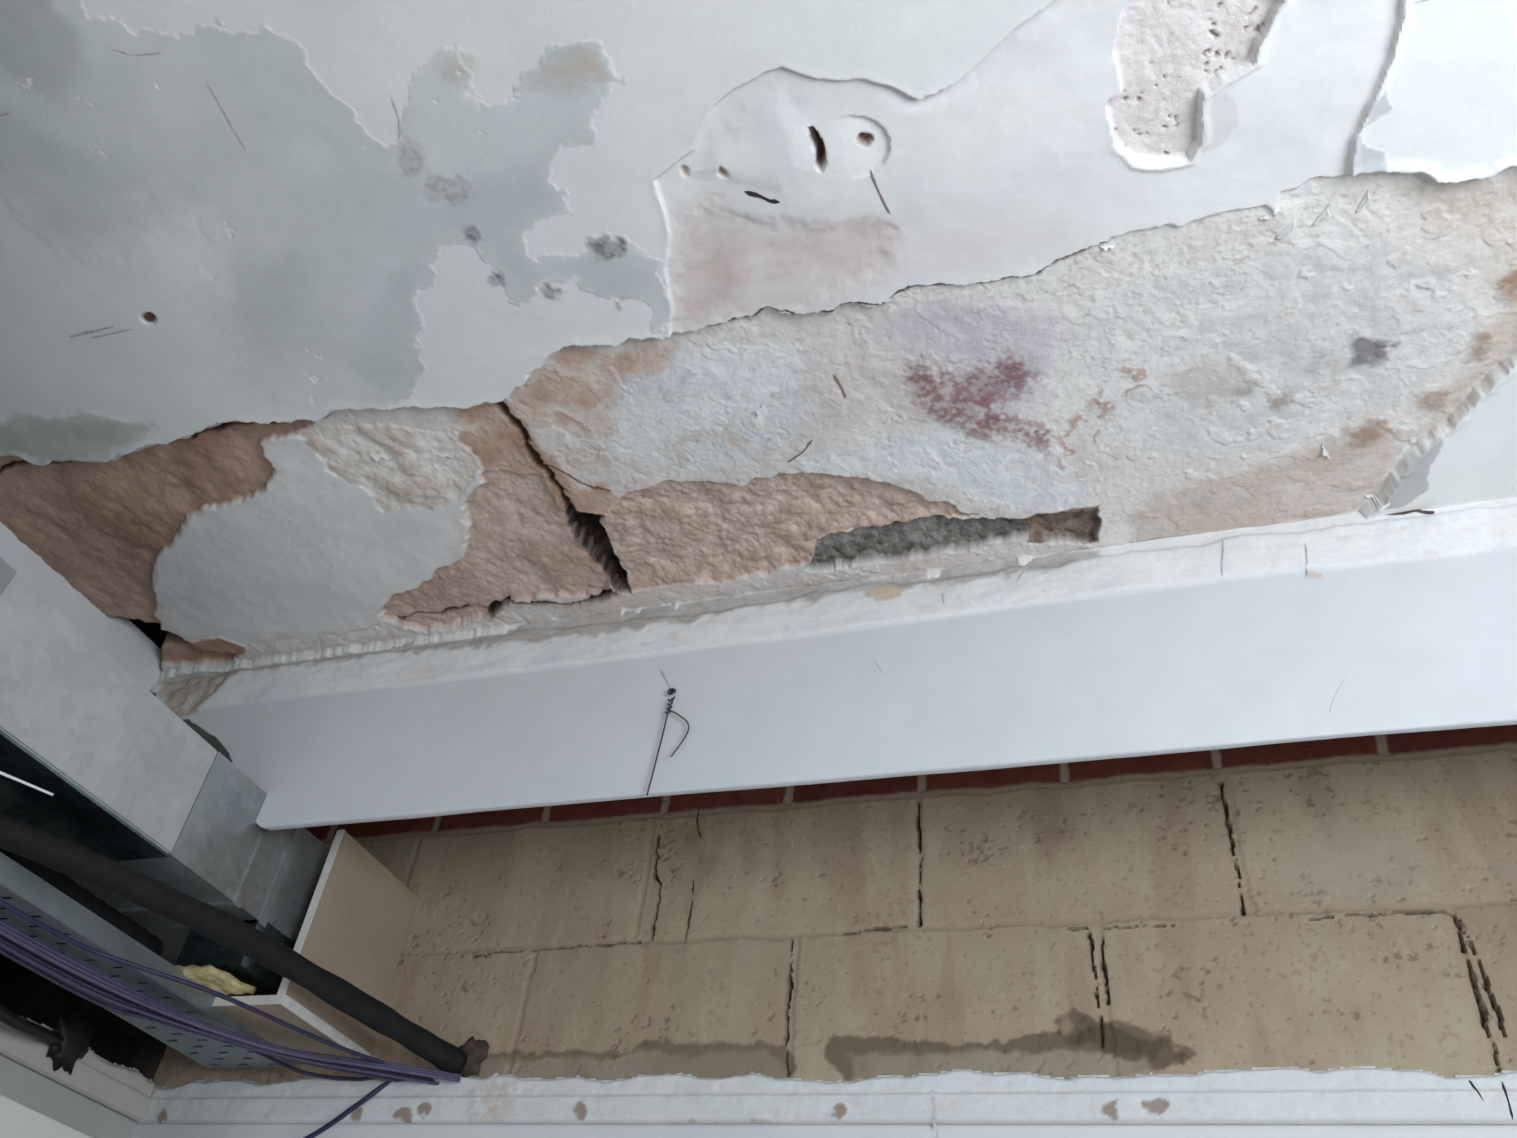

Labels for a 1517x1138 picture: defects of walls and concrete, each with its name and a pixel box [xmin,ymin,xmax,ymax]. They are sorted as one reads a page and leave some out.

leakage [0,0,675,422]
spalling [0,0,1517,681]
leakage [844,290,1077,460]
crack [398,401,632,625]
crack [474,950,510,958]
crack [565,834,694,949]
crack [783,941,794,1046]
crack [842,801,923,935]
leakage [823,1006,1200,1082]
crack [1067,924,1174,1023]
crack [1217,780,1246,916]
crack [1309,909,1513,1119]